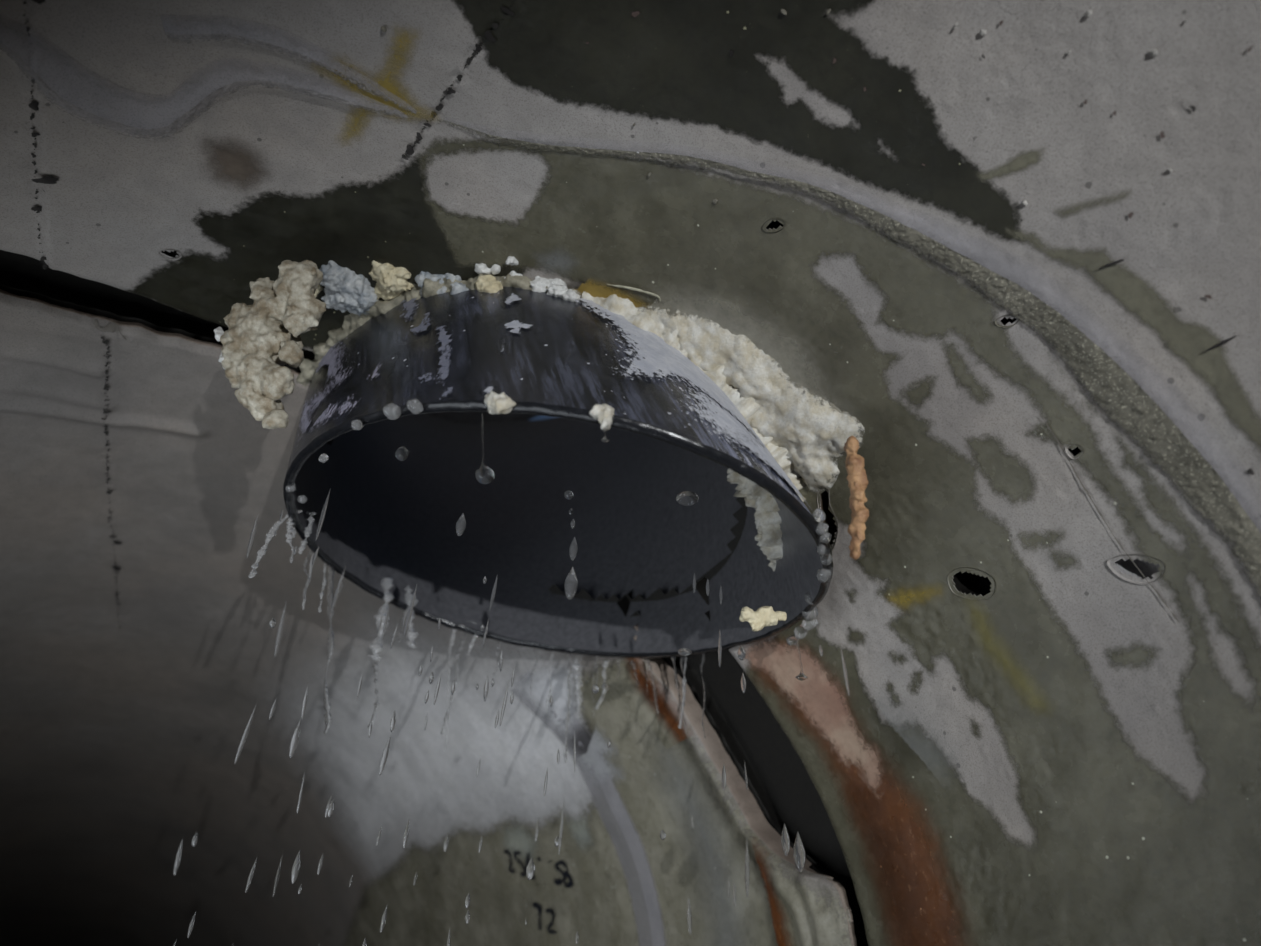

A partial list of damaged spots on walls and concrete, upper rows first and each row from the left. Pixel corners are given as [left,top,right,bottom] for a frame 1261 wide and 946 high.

crack [28,77,59,269]
damp [452,0,1261,447]
damp [127,138,1261,946]
rust [629,658,687,742]
rust [745,641,964,946]